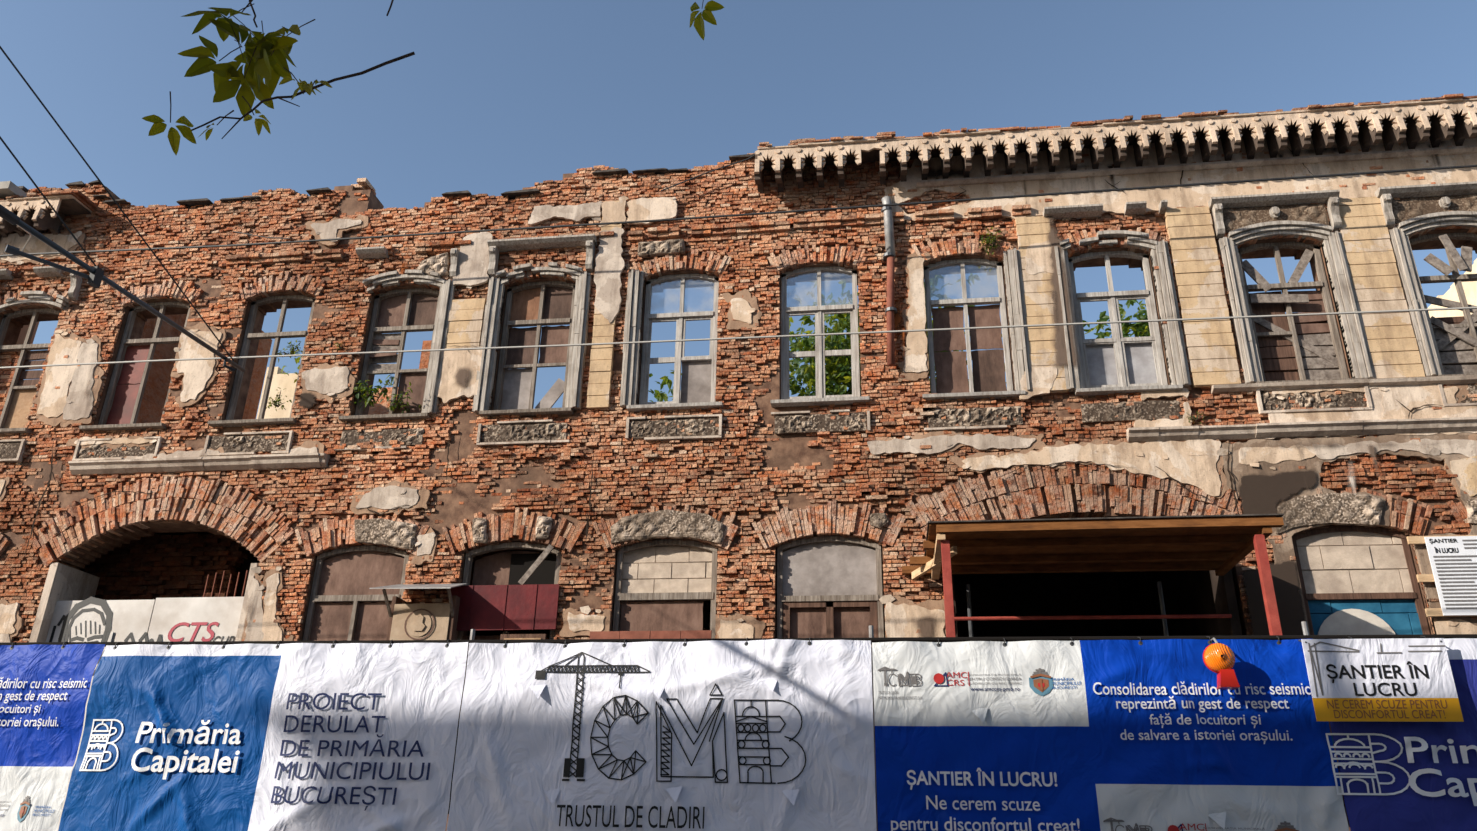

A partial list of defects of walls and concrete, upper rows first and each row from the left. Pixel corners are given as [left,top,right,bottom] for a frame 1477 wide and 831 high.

peeling [0,231,86,266]
peeling [305,214,369,247]
peeling [452,229,493,289]
peeling [528,196,678,323]
peeling [865,252,1477,535]
spalling [277,440,403,460]
spalling [497,448,585,461]
peeling [0,477,11,502]
spalling [856,483,905,501]
peeling [350,481,437,565]
peeling [0,599,24,642]
peeling [241,566,293,641]